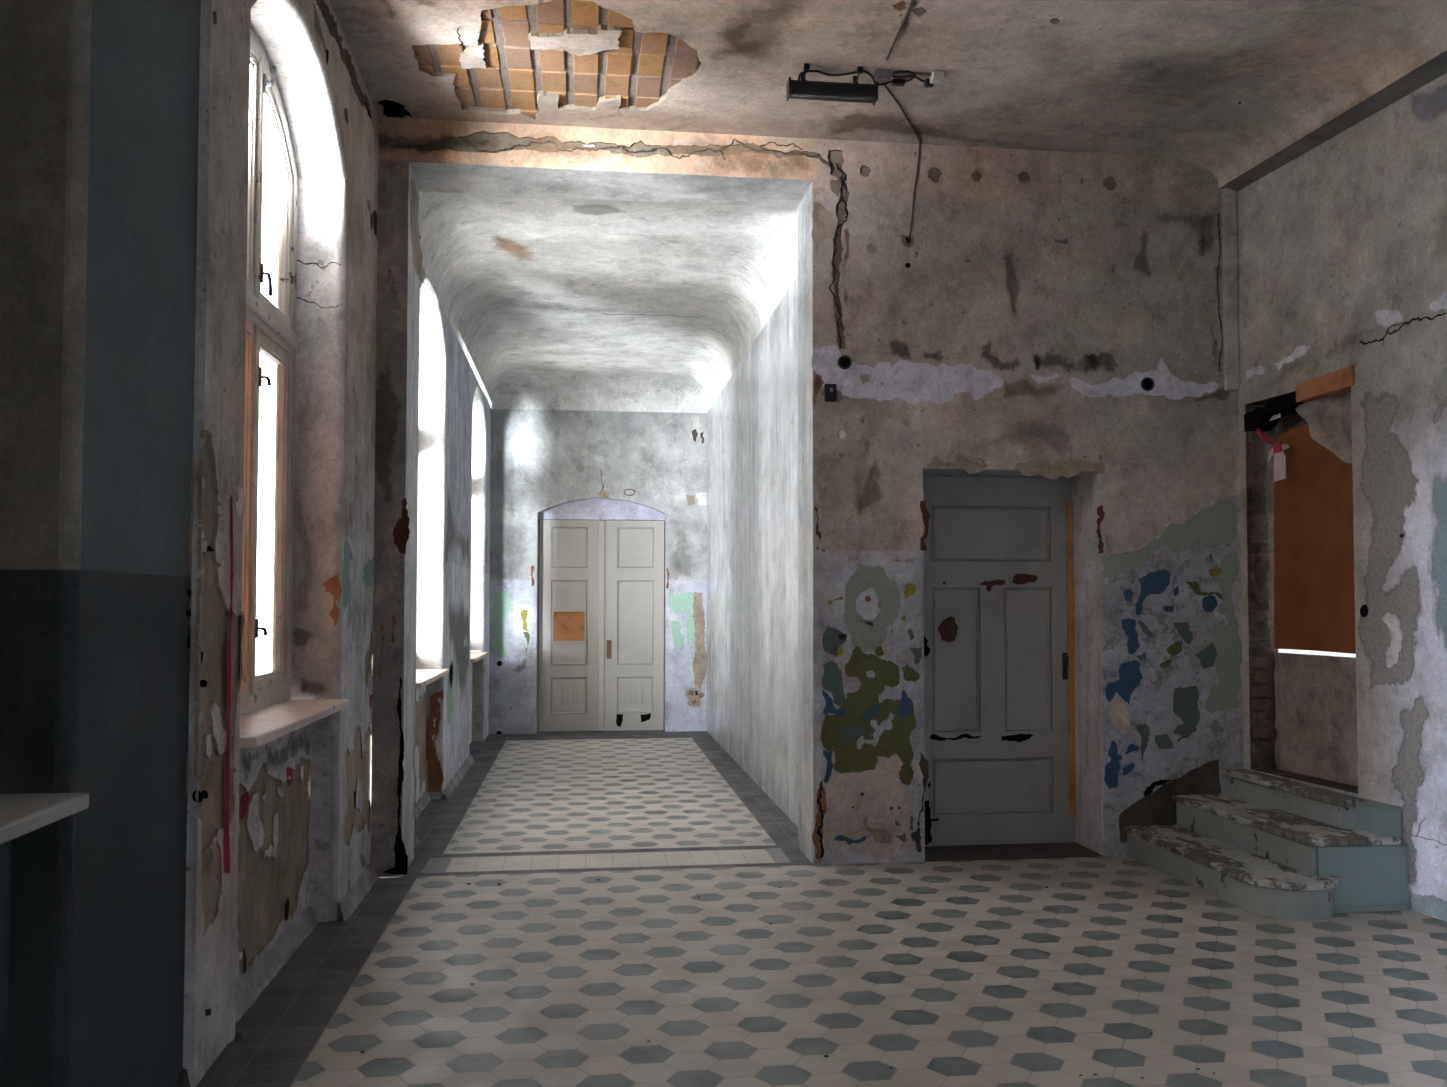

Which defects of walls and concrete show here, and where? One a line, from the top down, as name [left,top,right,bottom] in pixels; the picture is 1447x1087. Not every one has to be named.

flaking render [412,0,703,120]
crack [313,0,849,350]
crack [296,260,341,308]
peeling [811,344,1004,404]
water stain [891,342,942,360]
water stain [983,344,1117,372]
crack [1360,312,1447,345]
flaking render [1096,394,1305,790]
flaking render [1359,392,1447,687]
flaking render [186,430,313,975]
flaking render [415,602,469,793]
flaking render [812,564,980,862]